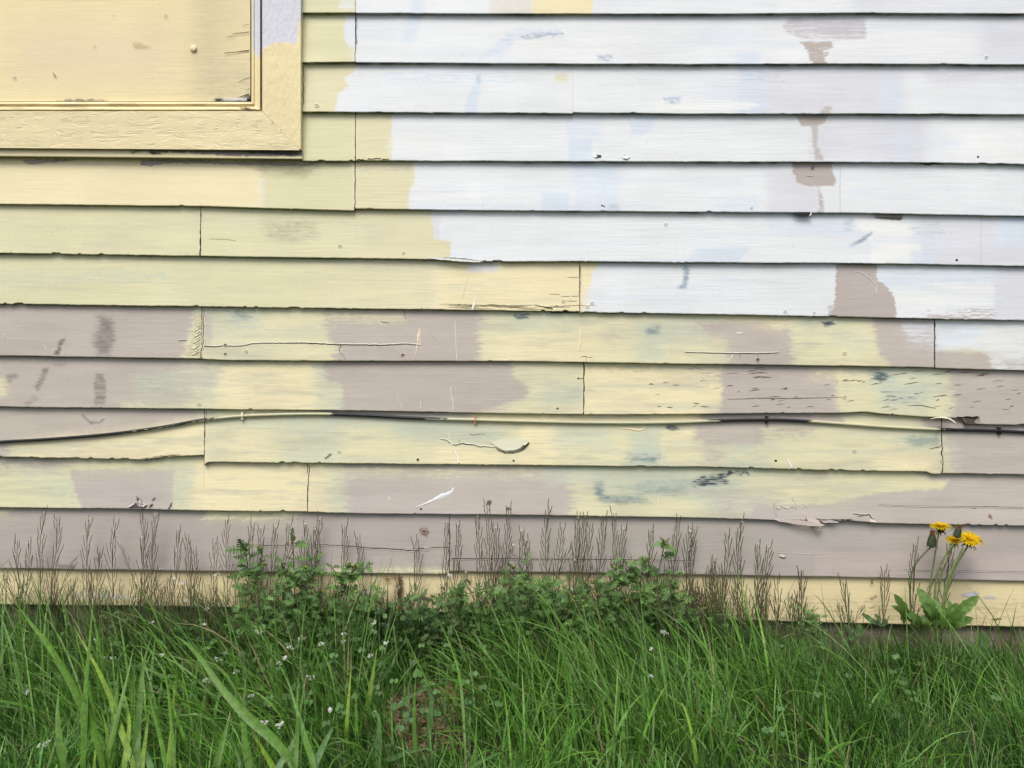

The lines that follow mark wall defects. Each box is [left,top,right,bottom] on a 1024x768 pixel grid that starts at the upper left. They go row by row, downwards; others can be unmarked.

crack [178,310,421,360]
crack [651,321,1021,472]
crack [440,434,495,448]